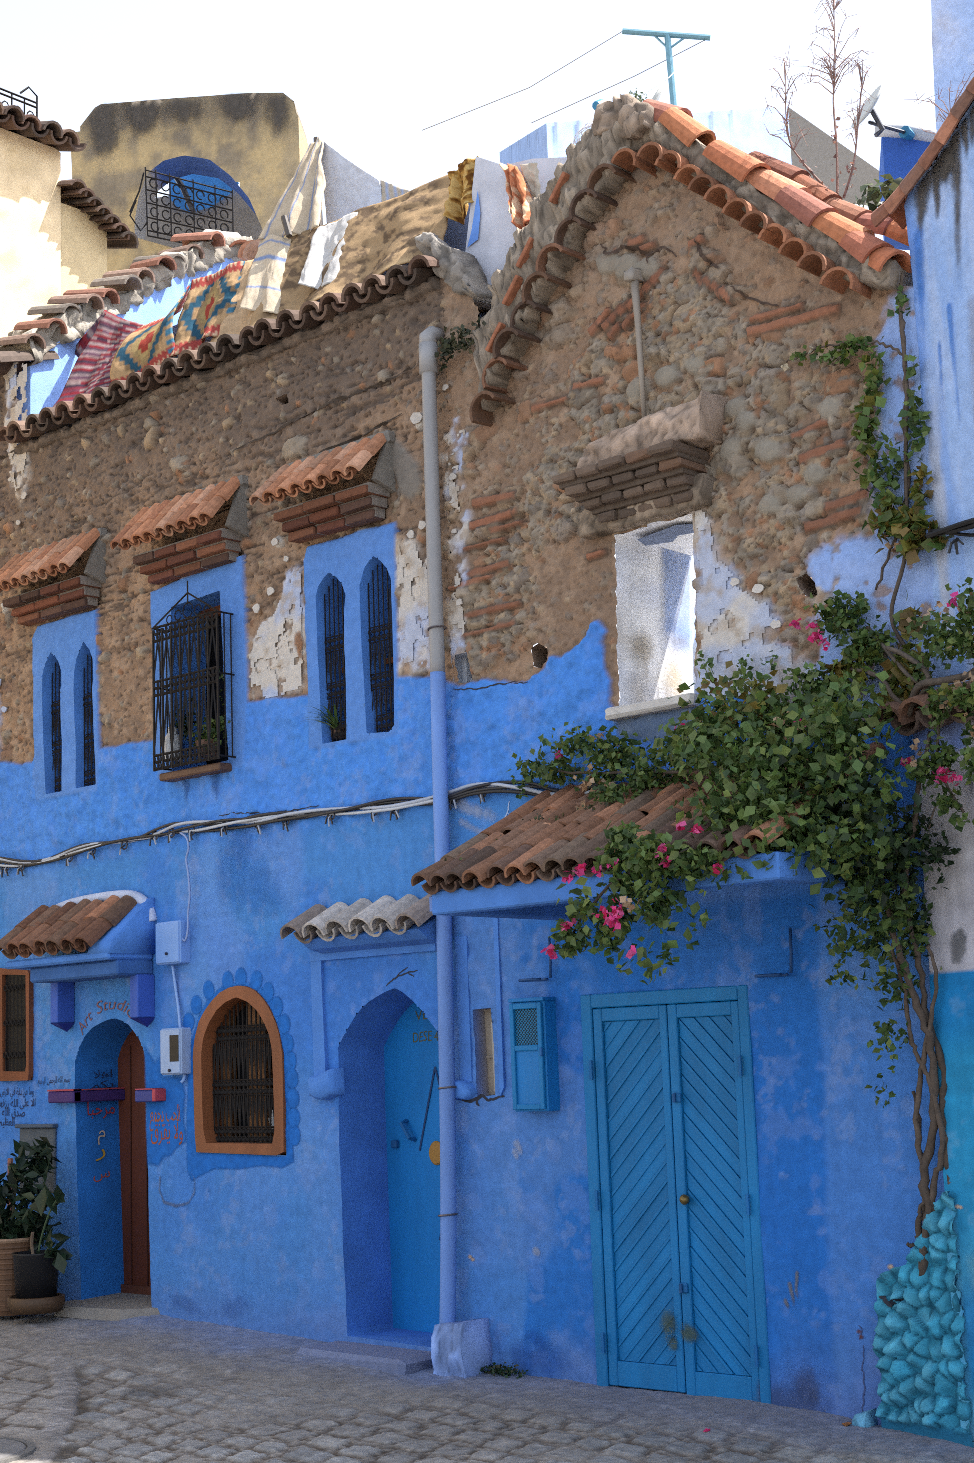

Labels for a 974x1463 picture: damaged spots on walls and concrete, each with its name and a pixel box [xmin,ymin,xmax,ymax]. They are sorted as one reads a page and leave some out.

leakage [915,106,974,299]
peeling [410,412,423,424]
peeling [446,429,465,534]
peeling [249,538,303,698]
peeling [397,521,429,664]
peeling [448,573,466,635]
peeling [637,510,836,732]
peeling [616,707,697,740]